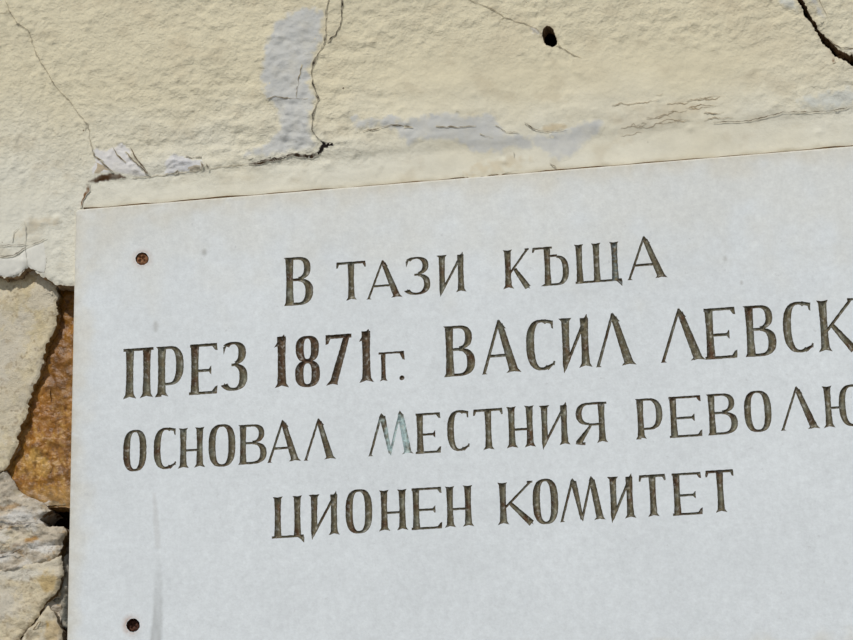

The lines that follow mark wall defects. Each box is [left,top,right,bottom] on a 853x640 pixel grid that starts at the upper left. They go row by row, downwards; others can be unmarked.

crack [471,0,579,57]
crack [798,2,853,66]
crack [0,1,93,154]
crack [132,0,344,179]
spalling [80,142,150,208]
spalling [162,152,210,176]
flaking render [0,223,47,278]